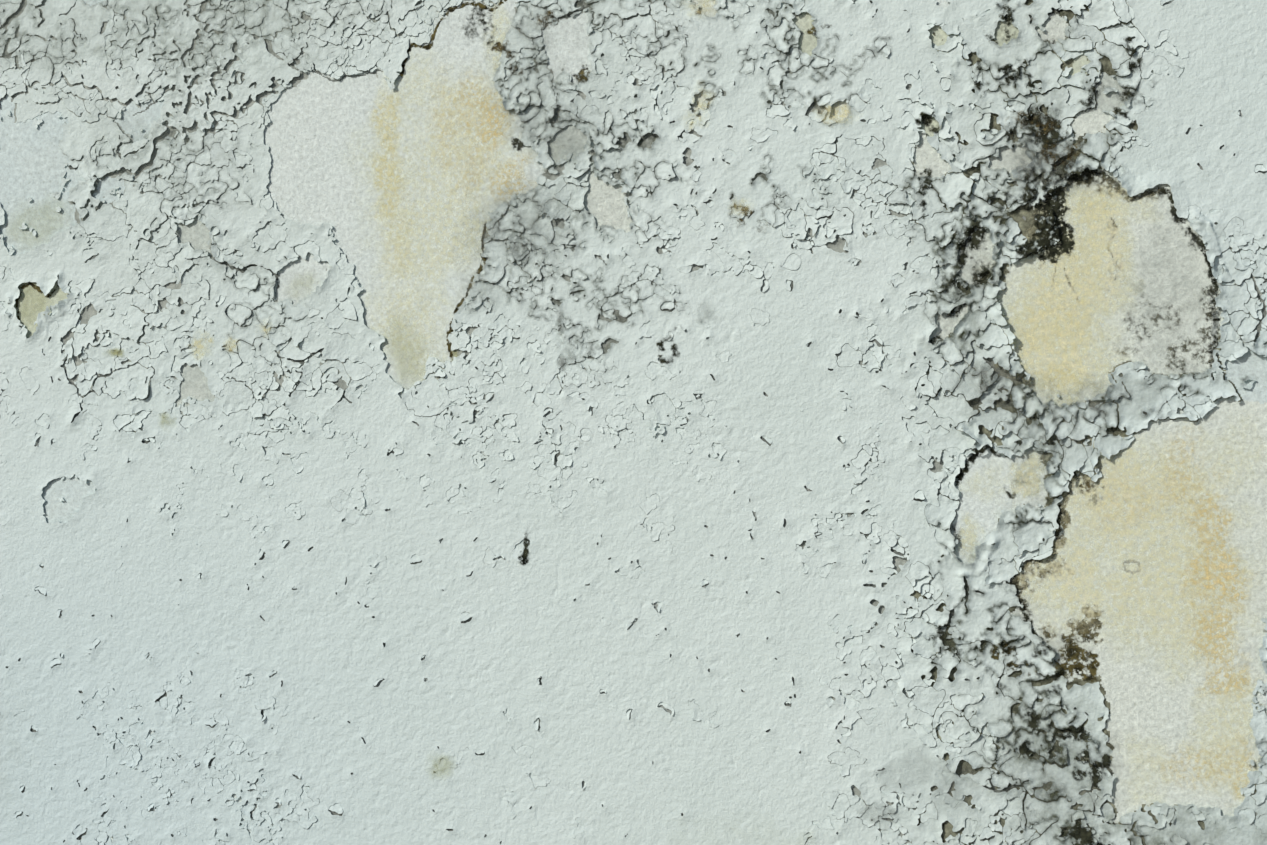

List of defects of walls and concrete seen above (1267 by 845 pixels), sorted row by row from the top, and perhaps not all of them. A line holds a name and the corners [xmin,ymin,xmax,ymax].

damp [400,0,538,82]
damp [428,94,523,165]
damp [915,112,939,133]
damp [903,169,942,219]
peeling [0,0,754,525]
damp [446,223,500,357]
peeling [677,0,1267,845]
damp [930,107,1231,789]
peeling [144,464,246,536]
peeling [217,504,270,565]
peeling [483,539,530,567]
damp [1030,785,1111,845]